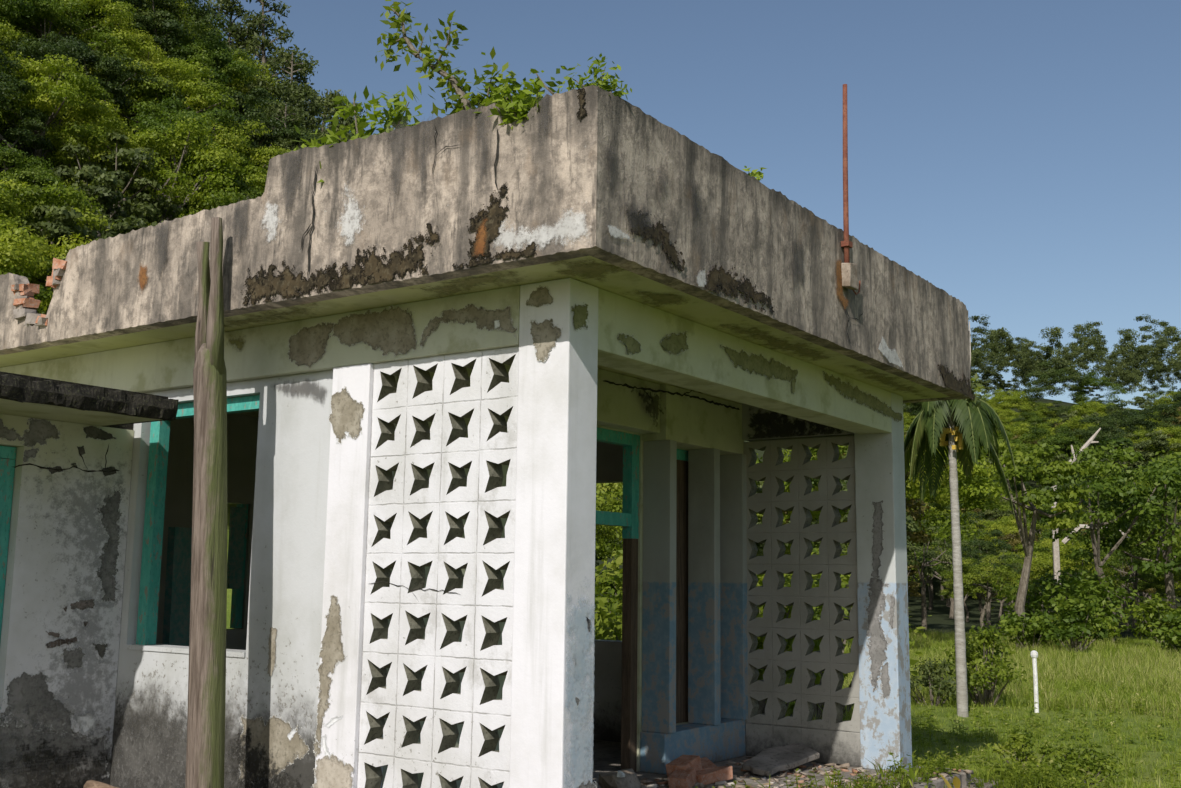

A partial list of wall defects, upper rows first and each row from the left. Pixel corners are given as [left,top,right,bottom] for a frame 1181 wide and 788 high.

corrosion [836,260,849,309]
peeling [287,285,589,367]
peeling [0,418,117,475]
crack [14,445,120,472]
peeling [328,386,365,444]
crack [604,380,740,410]
peeling [45,466,124,670]
peeling [865,500,895,700]
peeling [0,671,113,788]
leakage [0,698,187,788]
peeling [239,595,355,788]